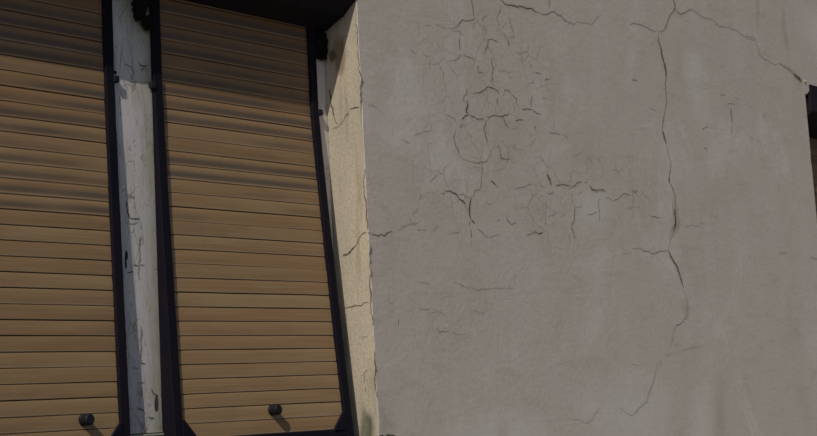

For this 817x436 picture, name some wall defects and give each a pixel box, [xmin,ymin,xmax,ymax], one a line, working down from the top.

crack [329,28,376,129]
crack [410,0,601,86]
crack [342,163,516,397]
crack [565,0,802,424]